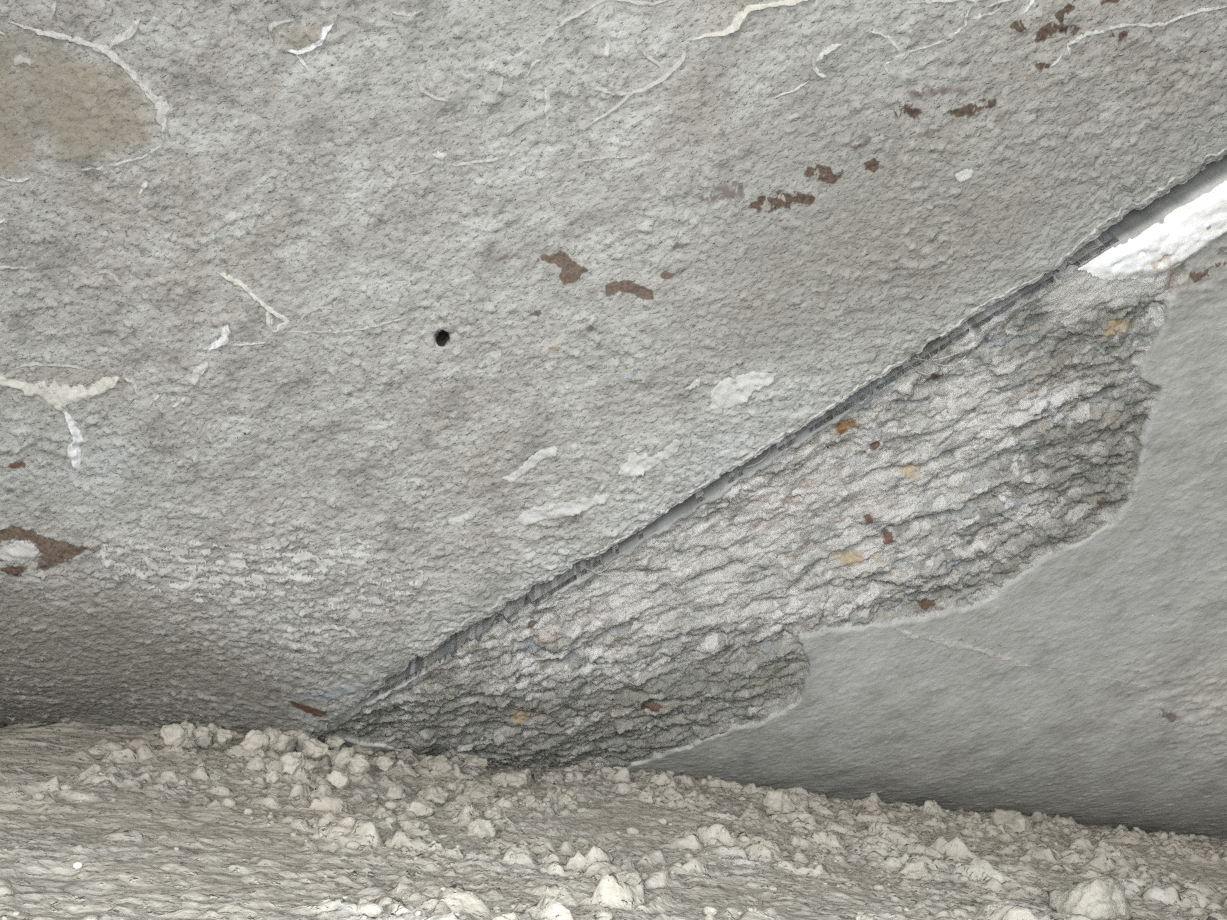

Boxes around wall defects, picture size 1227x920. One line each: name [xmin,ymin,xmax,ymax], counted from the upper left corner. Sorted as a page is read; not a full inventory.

crack [496,0,668,130]
crack [585,0,808,128]
crack [871,0,1034,76]
rust [1010,3,1080,42]
crack [1050,4,1227,67]
rust [698,183,815,213]
crack [217,272,406,335]
rust [541,250,588,285]
rust [605,280,654,300]
spalling [295,229,1184,769]
rust [0,525,89,576]
peeling [96,530,439,653]